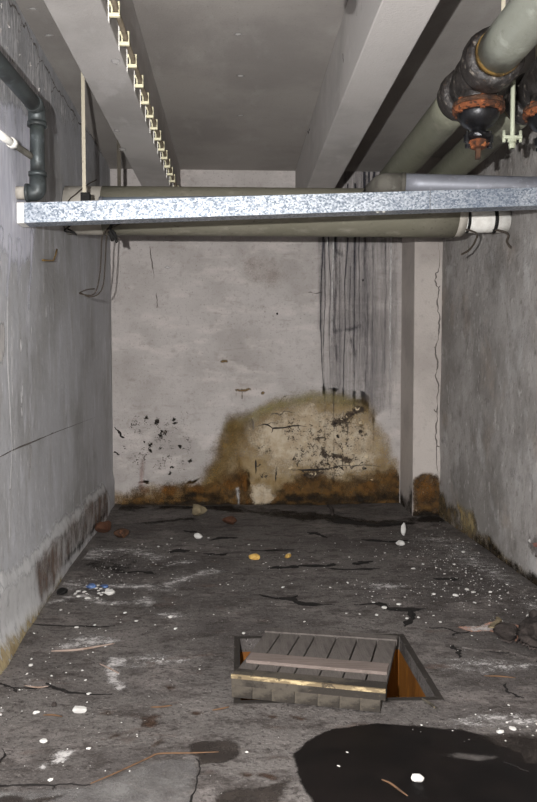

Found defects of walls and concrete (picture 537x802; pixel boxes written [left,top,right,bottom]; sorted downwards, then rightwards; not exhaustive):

leakage [345,171,375,188]
crack [433,245,441,477]
crack [252,395,307,433]
leakage [0,237,537,675]
crack [255,460,380,481]
crack [259,594,334,606]
crack [353,602,537,662]
crack [0,682,112,695]
leakage [189,740,239,765]
crack [0,782,91,790]
crack [189,758,201,802]
leakage [215,781,287,802]